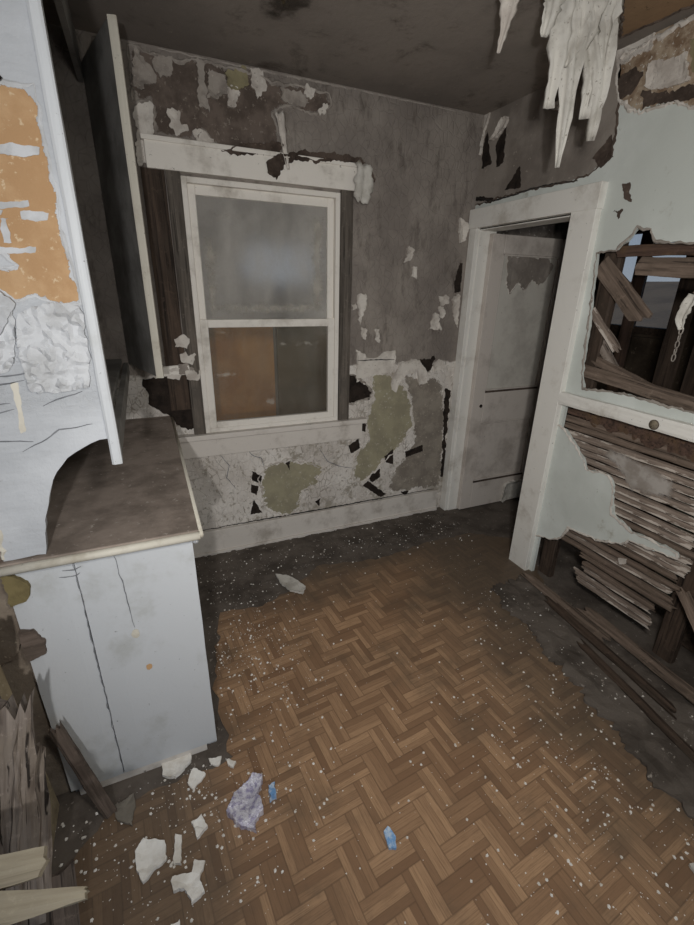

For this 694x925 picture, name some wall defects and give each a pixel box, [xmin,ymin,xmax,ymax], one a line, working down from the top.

peeling [497,0,520,54]
peeling [540,0,694,168]
peeling [126,43,376,204]
flaking render [479,112,509,169]
peeling [351,293,380,343]
peeling [428,263,463,330]
crack [0,373,25,414]
crack [0,424,90,452]
crack [43,391,82,406]
peeling [348,356,451,497]
peeling [251,458,327,517]
spalling [535,424,679,560]